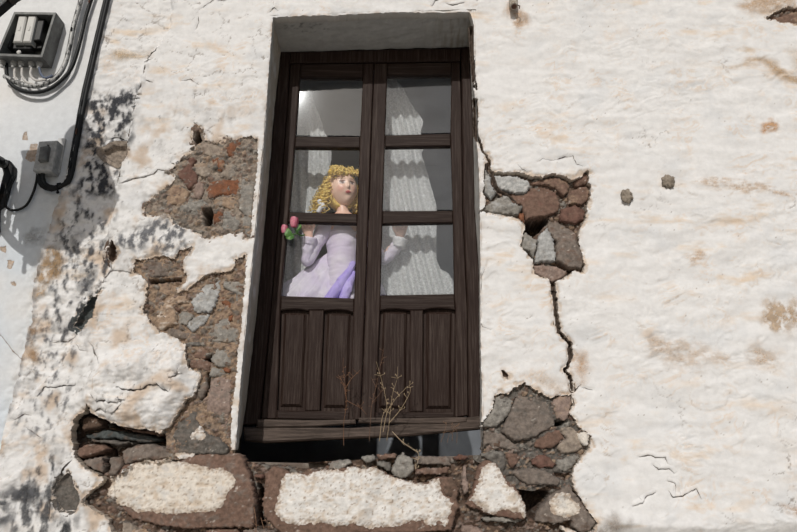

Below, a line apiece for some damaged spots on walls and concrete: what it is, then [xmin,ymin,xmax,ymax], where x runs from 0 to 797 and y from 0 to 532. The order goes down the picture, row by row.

crack [430,0,464,8]
spalling [767,9,797,24]
crack [468,26,516,204]
water stain [30,89,138,342]
water stain [116,219,185,251]
spalling [49,124,596,532]
crack [551,281,592,405]
crack [631,450,705,506]